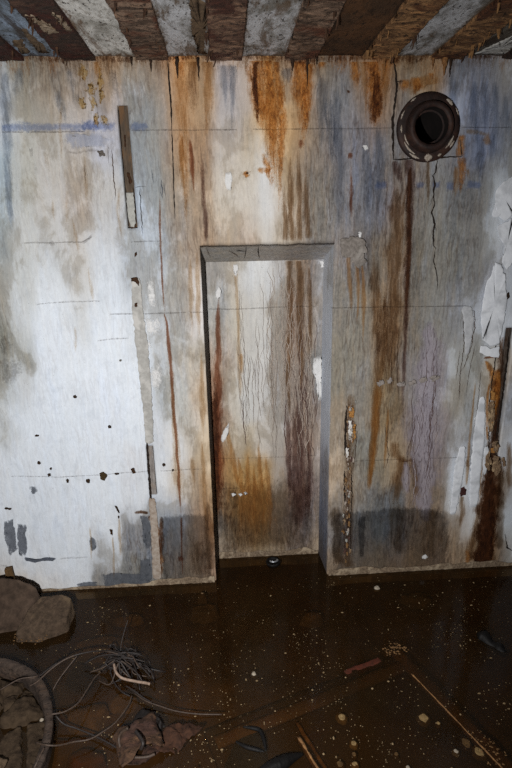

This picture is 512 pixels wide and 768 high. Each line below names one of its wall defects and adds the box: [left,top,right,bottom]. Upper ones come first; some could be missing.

crack [391,61,412,160]
crack [430,141,462,289]
peeling [450,177,512,515]
spalling [341,400,357,563]
corrosion [474,424,501,562]
water stain [329,560,512,576]